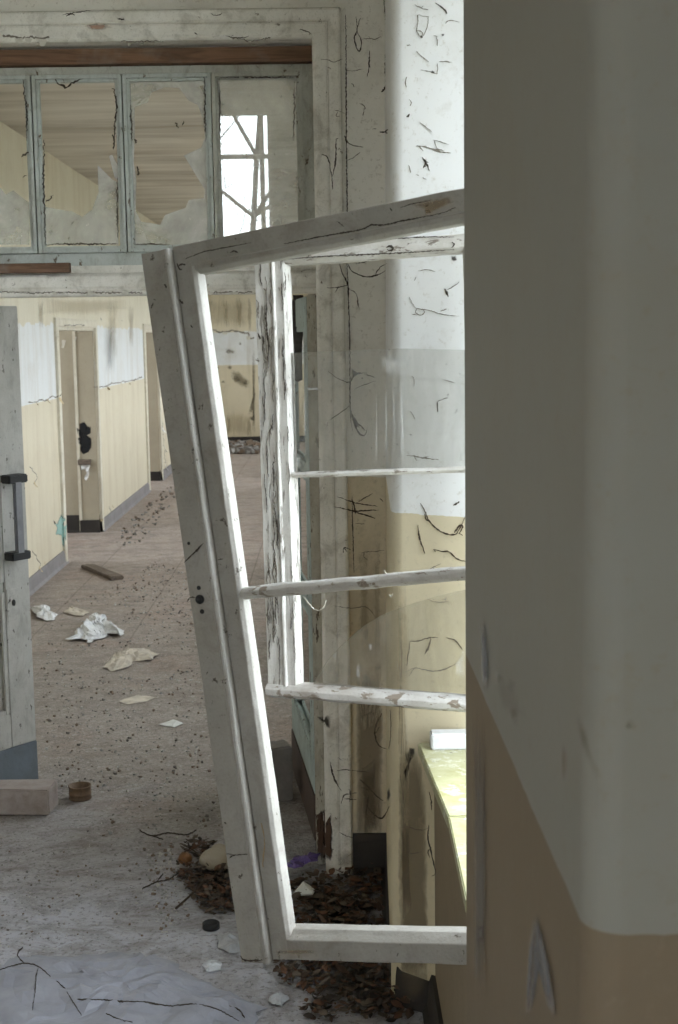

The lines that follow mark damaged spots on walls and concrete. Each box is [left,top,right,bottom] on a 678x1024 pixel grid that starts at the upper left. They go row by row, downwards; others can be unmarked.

crack [256,3,465,678]
peeling [315,810,332,859]